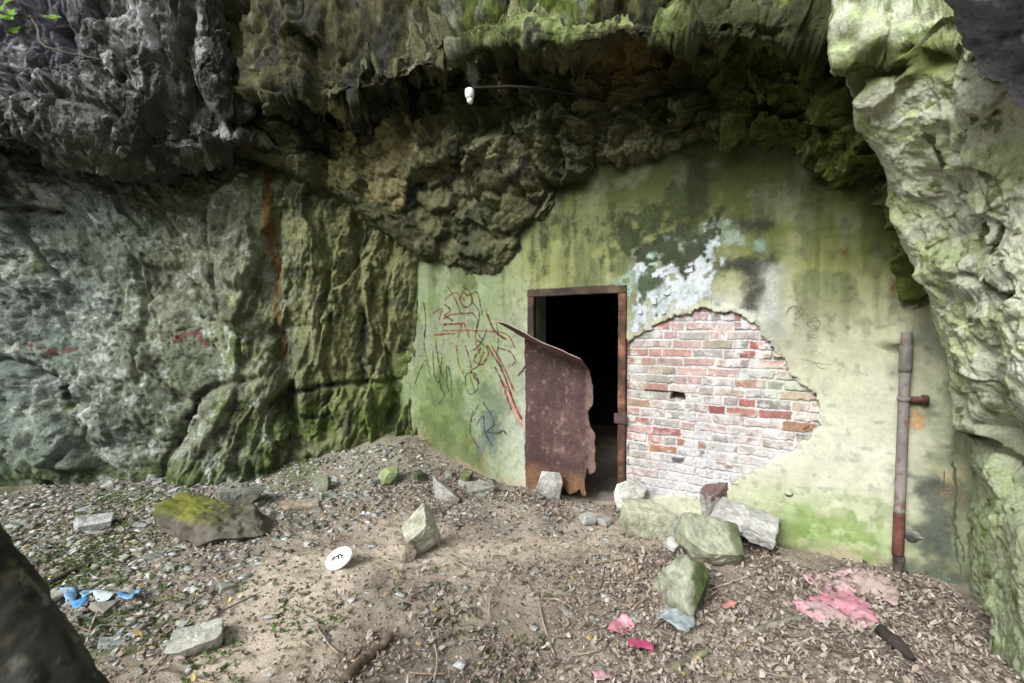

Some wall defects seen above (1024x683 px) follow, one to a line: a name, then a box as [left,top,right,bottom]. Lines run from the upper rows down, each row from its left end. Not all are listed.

damp [529,155,724,304]
damp [743,265,780,324]
flaking render [619,222,821,499]
rust [909,410,924,429]
rust [892,511,906,558]